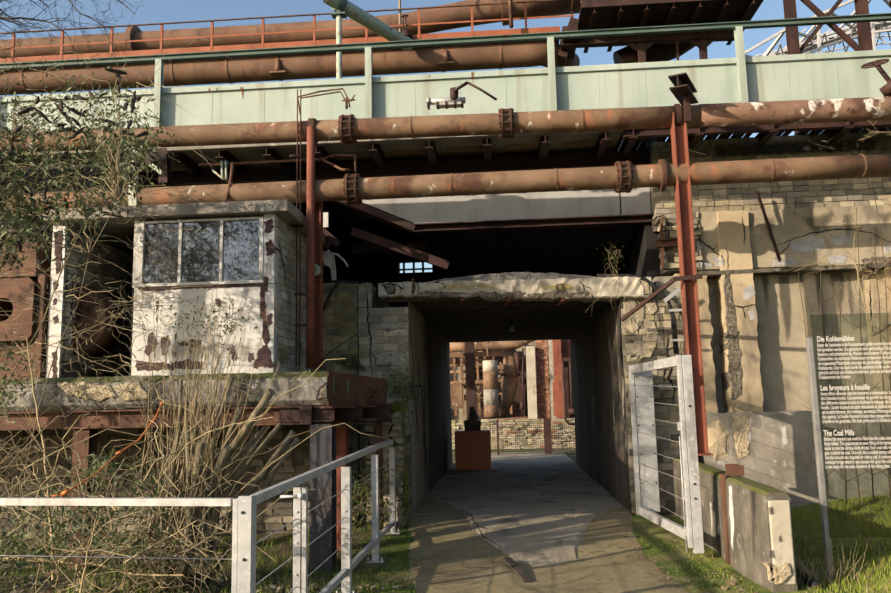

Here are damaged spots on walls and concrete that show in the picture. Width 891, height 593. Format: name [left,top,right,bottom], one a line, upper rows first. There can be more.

peeling [264,219,281,256]
spalling [651,213,680,276]
crack [775,227,891,259]
peeling [53,230,63,324]
peeling [135,277,276,371]
spalling [693,212,756,459]
damp [779,276,790,330]
damp [831,273,850,308]